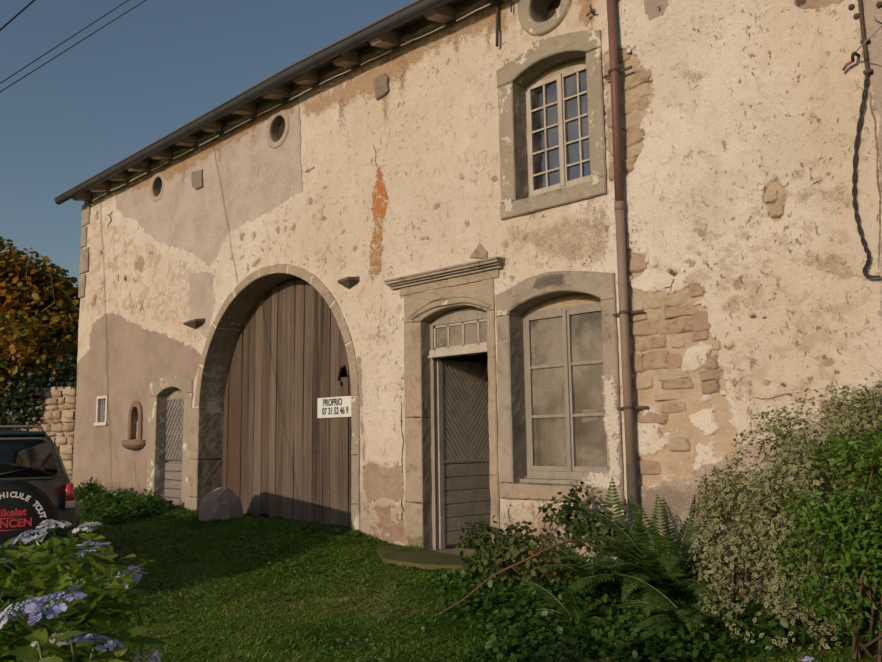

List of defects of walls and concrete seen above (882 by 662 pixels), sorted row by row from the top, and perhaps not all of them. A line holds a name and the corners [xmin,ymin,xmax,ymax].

flaking render [644,0,668,21]
flaking render [795,0,844,12]
corrosion [370,162,388,280]
flaking render [758,182,790,225]
flaking render [135,256,145,272]
flaking render [362,462,406,543]